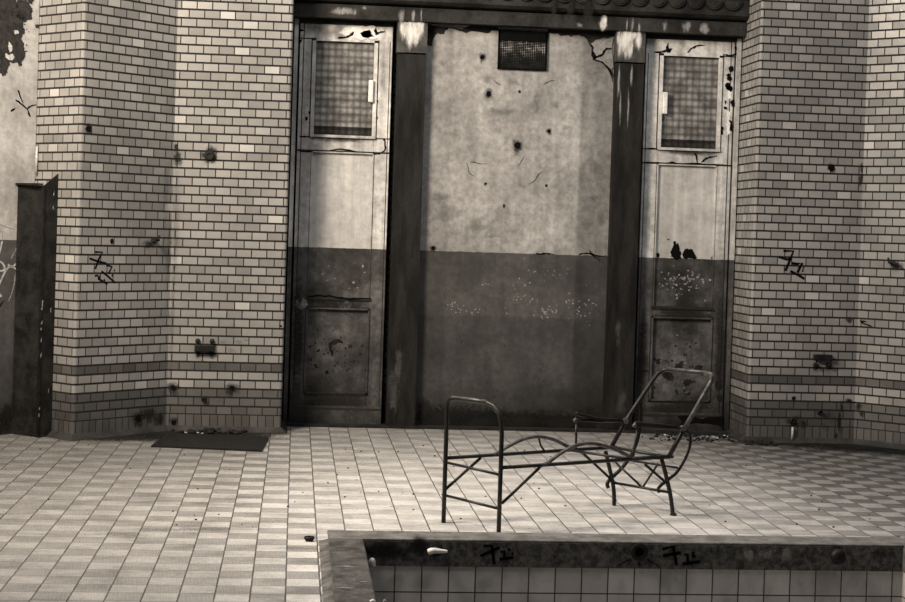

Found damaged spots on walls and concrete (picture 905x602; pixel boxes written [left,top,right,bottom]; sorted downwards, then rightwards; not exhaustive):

peeling [0,0,40,76]
crack [589,43,613,82]
crack [11,90,36,117]
peeling [656,239,711,299]
peeling [643,329,703,400]